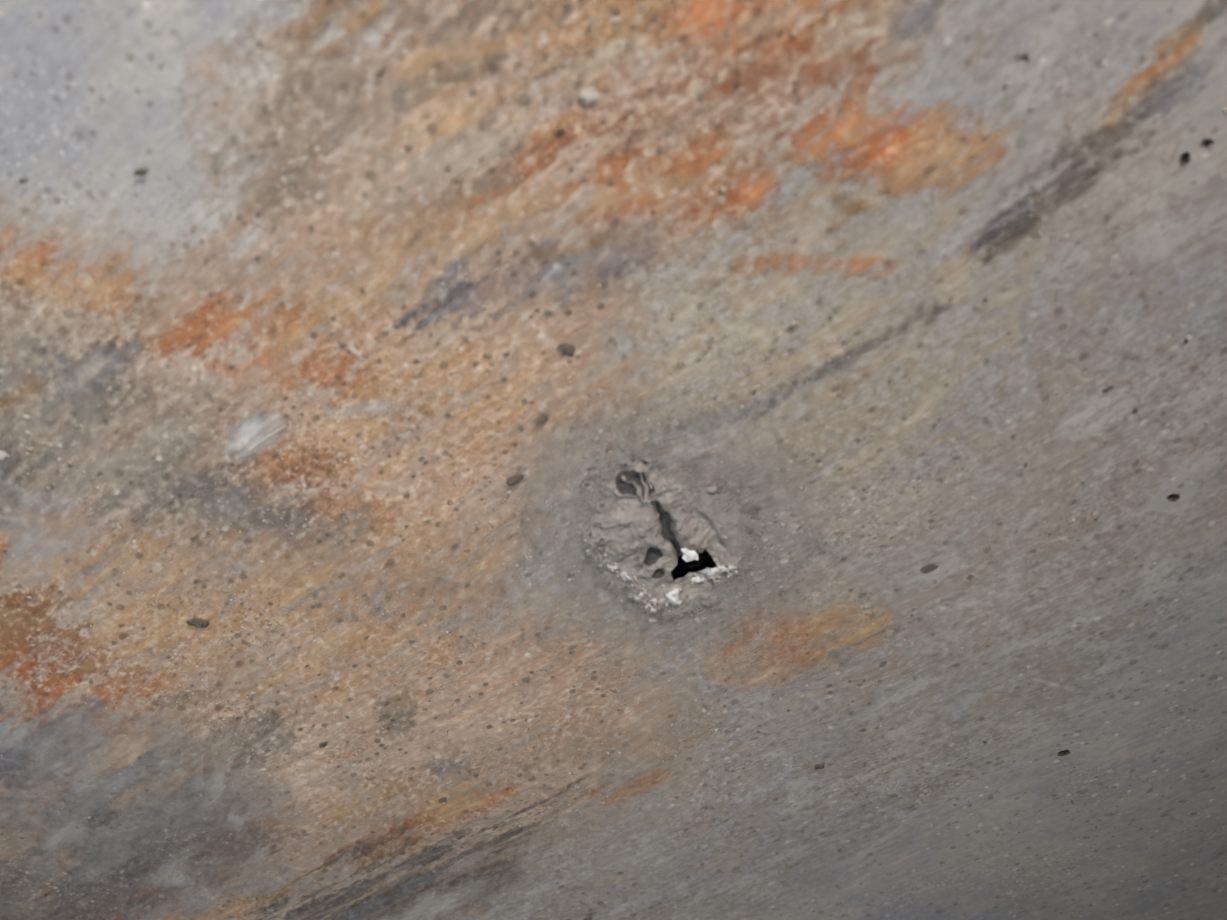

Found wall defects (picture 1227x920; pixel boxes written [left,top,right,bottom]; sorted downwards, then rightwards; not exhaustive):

corrosion [149,753,606,920]
corrosion [0,0,997,882]
spalling [577,446,770,625]
leakage [260,163,1164,920]